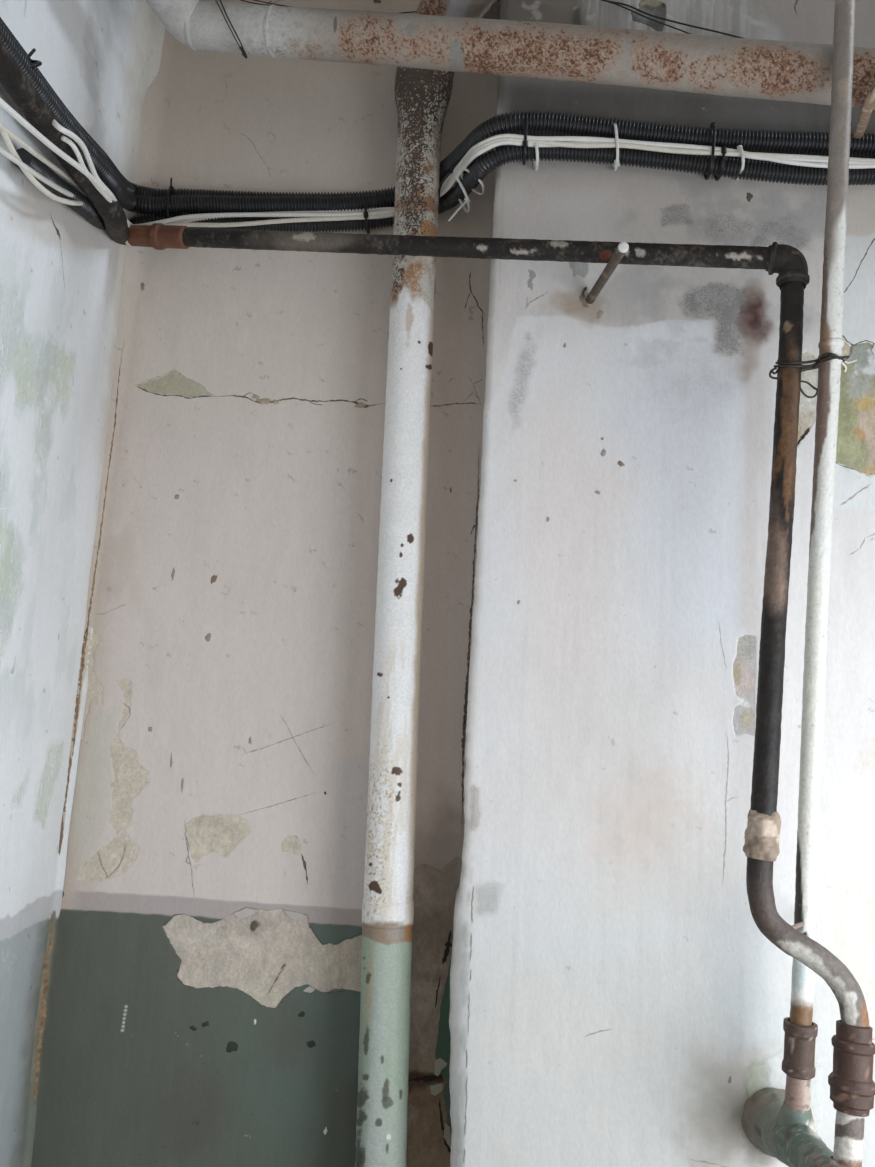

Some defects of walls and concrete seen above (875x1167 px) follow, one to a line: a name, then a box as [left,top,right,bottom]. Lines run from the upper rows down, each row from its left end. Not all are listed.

crack [844,238,875,292]
crack [219,392,383,408]
peeling [797,351,817,445]
flaking render [836,336,875,478]
peeling [77,626,104,741]
peeling [77,678,149,882]
peeling [184,814,250,896]
peeling [281,835,308,883]
flaking render [162,907,362,1025]
flaking render [406,857,467,1167]